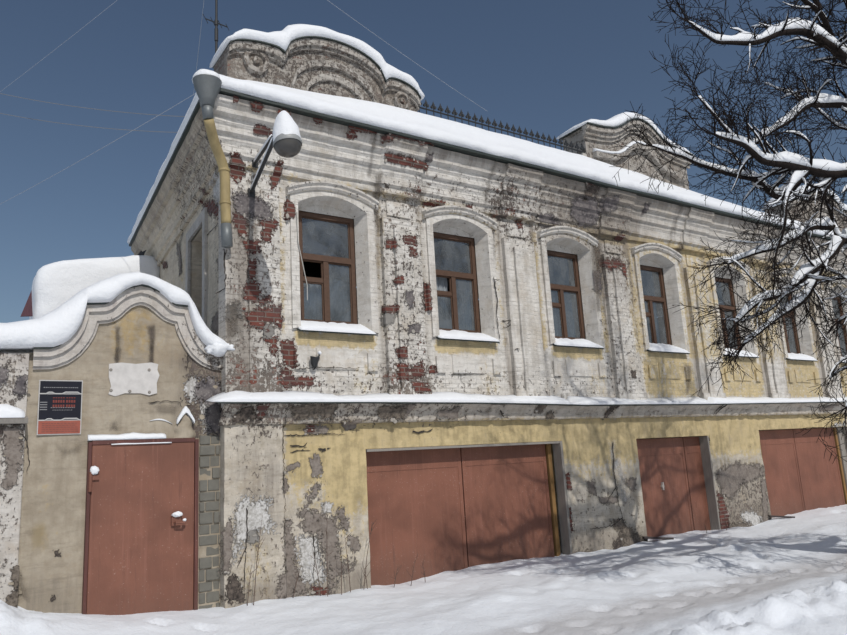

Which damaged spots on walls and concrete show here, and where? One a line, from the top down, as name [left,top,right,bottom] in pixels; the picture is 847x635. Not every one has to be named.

flaking render [346,125,434,173]
peeling [227,150,316,390]
flaking render [381,275,433,317]
peeling [407,323,422,335]
peeling [0,367,31,399]
flaking render [395,345,438,394]
spalling [377,403,417,424]
peeling [0,424,25,490]
peeling [714,460,770,529]
peeling [217,453,361,605]
peeling [0,563,22,608]